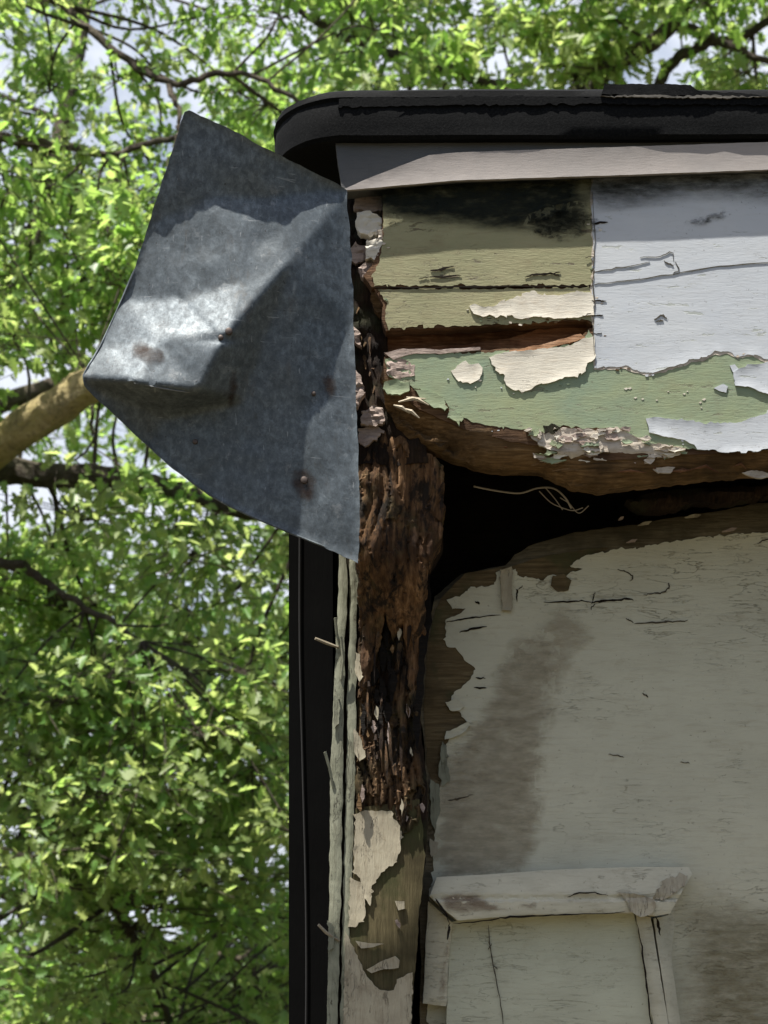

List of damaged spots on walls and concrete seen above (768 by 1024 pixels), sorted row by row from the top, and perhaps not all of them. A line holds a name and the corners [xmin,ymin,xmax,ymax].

damp [377,179,585,234]
peeling [351,179,768,474]
crack [373,191,768,365]
peeling [327,548,607,1024]
crack [435,892,661,1024]
peeling [618,872,688,917]